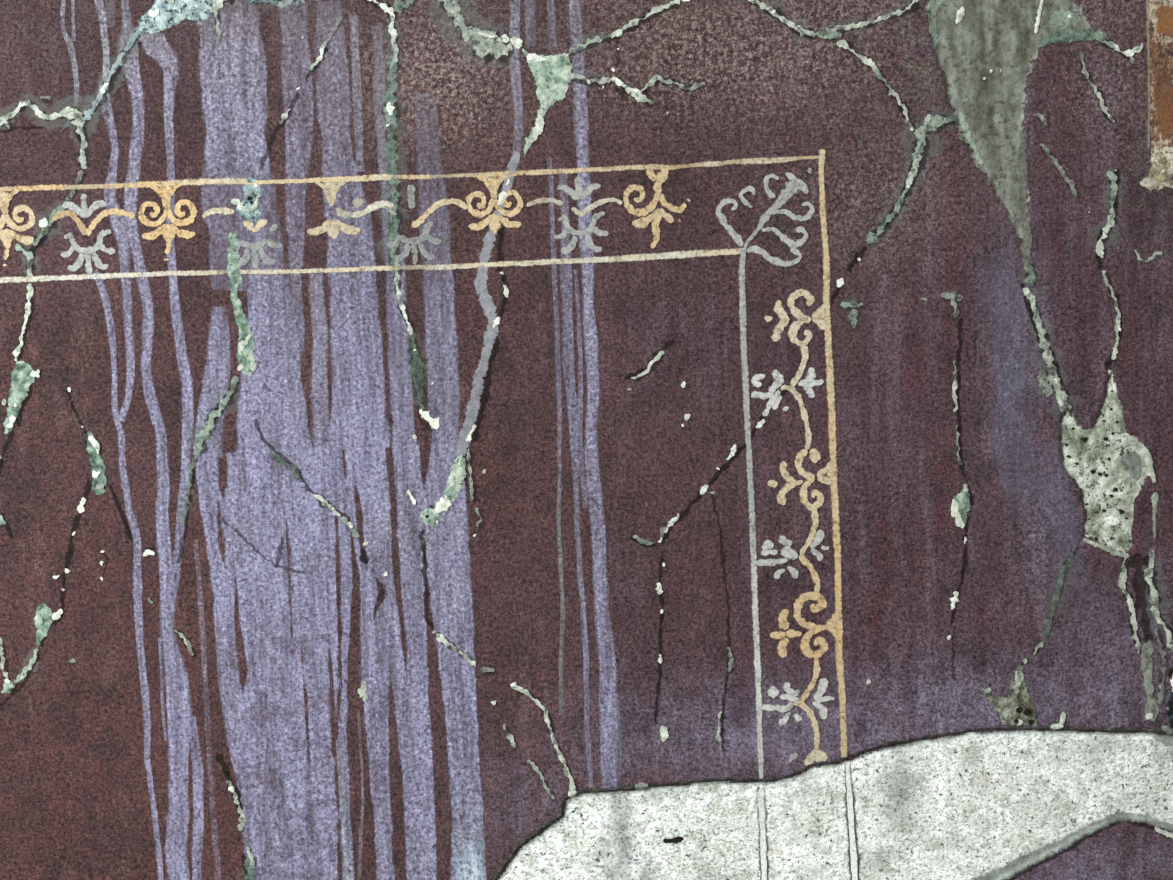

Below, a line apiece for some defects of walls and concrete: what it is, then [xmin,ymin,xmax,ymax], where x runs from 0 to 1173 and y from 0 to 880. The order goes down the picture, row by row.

damp [61,0,79,99]
crack [0,29,141,361]
damp [94,0,486,880]
crack [364,0,527,537]
damp [509,0,523,155]
damp [550,0,618,789]
crack [569,0,705,115]
crack [746,0,964,319]
spalling [950,484,974,532]
spalling [926,0,1108,269]
spalling [1061,373,1159,558]
spalling [493,639,1173,880]